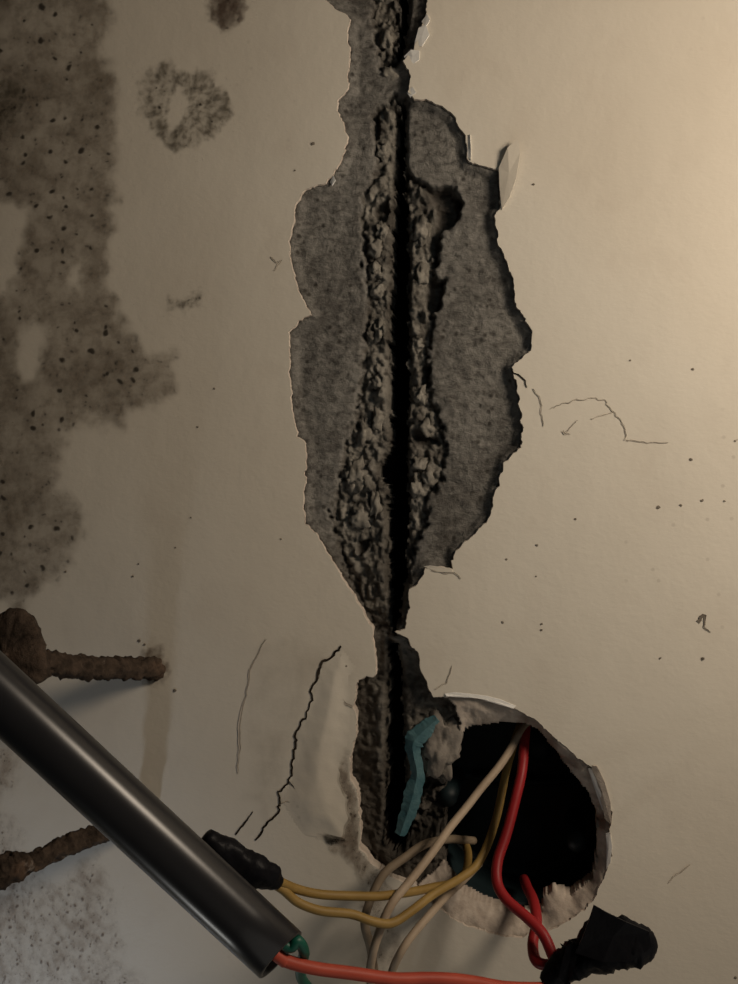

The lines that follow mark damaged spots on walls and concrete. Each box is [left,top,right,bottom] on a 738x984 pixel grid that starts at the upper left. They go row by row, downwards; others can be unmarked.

crack [401,0,409,55]
damp [0,33,113,233]
damp [148,64,191,150]
damp [191,75,229,134]
damp [43,298,159,431]
damp [0,445,62,588]
crack [383,110,411,849]
spalling [289,0,612,936]
crack [235,639,342,841]